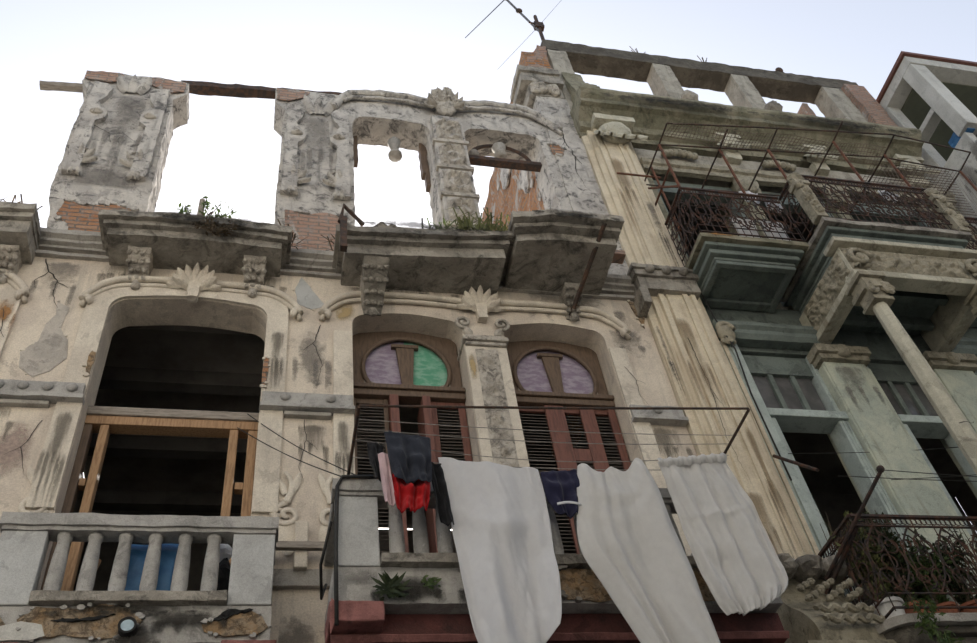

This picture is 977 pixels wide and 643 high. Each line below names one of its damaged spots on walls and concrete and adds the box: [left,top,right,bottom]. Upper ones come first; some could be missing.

flaking render [497,168,542,201]
crack [34,259,68,308]
peeling [19,300,69,377]
spalling [260,356,271,388]
crack [4,420,43,470]
damp [654,428,690,457]
damp [750,484,792,553]
spalling [0,603,146,643]
spalling [200,606,272,639]